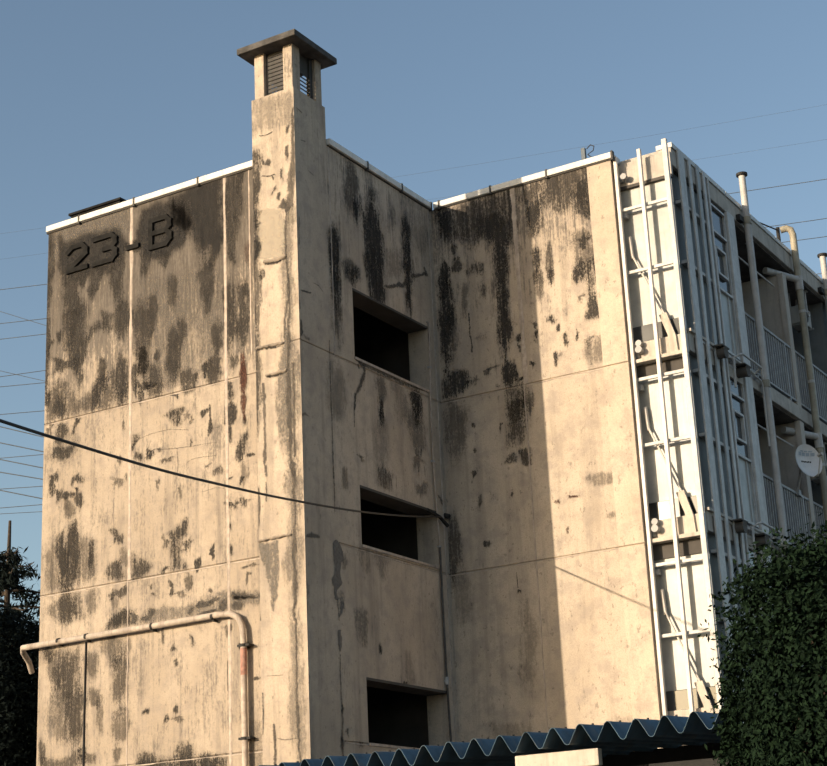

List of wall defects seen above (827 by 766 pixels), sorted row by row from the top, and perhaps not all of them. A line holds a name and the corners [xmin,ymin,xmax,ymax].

leakage [328,160,386,337]
leakage [45,150,263,463]
leakage [434,167,591,466]
leakage [573,258,599,319]
rust [239,354,247,418]
leakage [50,523,94,623]
leakage [104,554,149,600]
leakage [161,519,193,597]
leakage [107,609,132,629]
leakage [113,654,127,702]
leakage [39,741,95,766]
leakage [136,742,227,766]